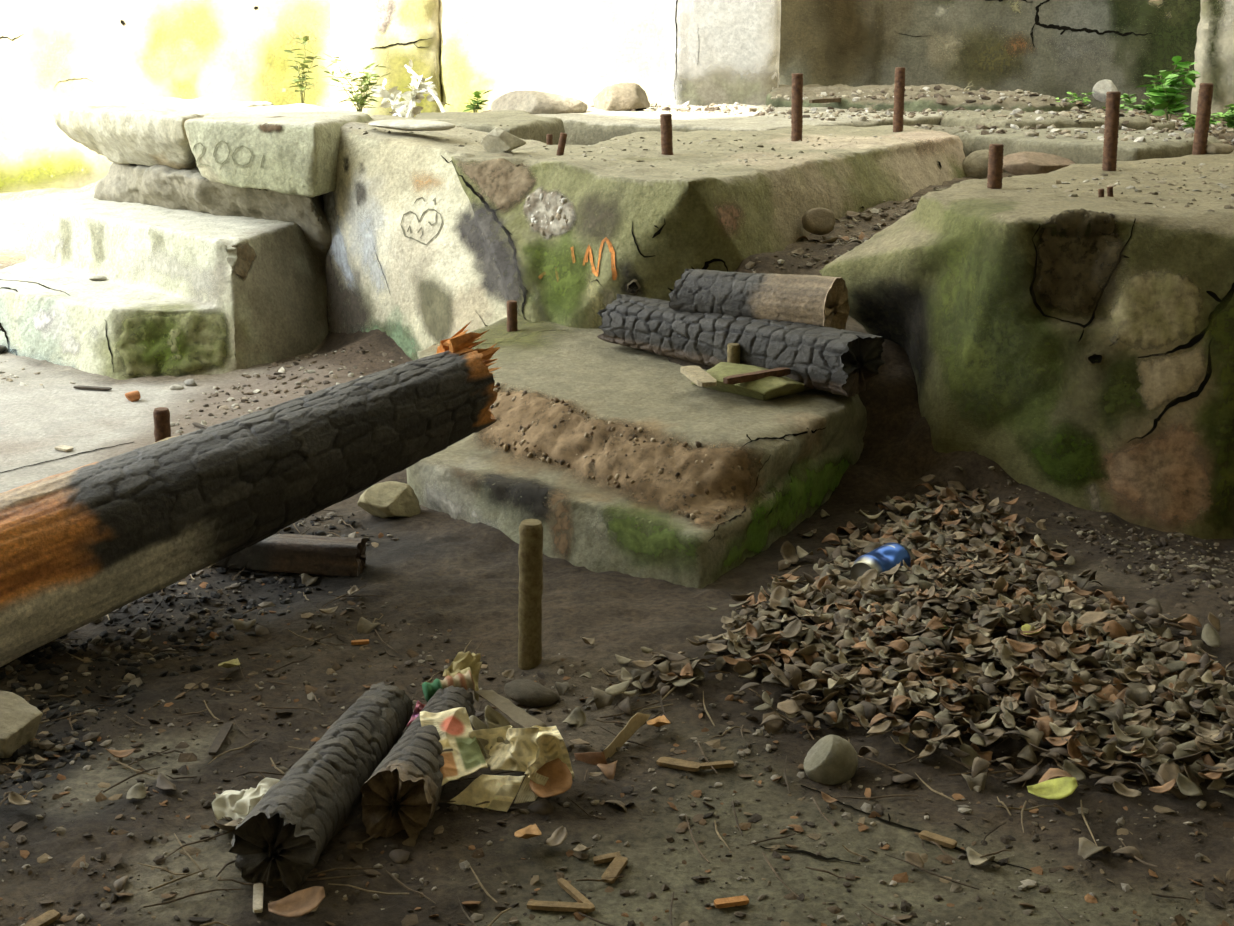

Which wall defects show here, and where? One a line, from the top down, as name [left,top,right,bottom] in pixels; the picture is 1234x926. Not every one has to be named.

crack [674,0,700,88]
crack [985,0,1152,47]
crack [0,323,17,355]
crack [0,279,70,296]
damp [854,289,926,389]
peeling [1036,208,1206,411]
crack [1029,219,1234,443]